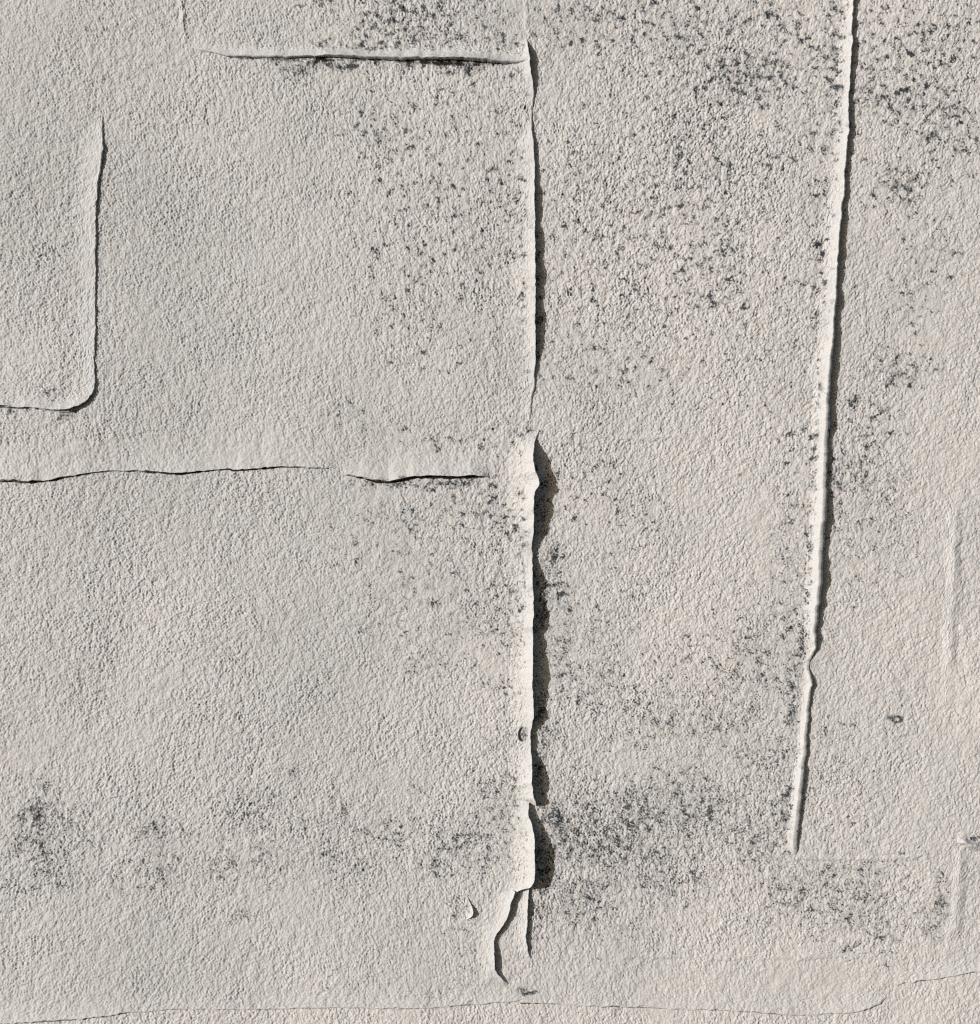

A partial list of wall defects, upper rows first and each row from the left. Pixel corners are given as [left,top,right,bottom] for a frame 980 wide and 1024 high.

leakage [275,0,540,374]
leakage [531,0,978,398]
crack [0,421,490,484]
leakage [387,322,936,961]
leakage [319,771,519,887]